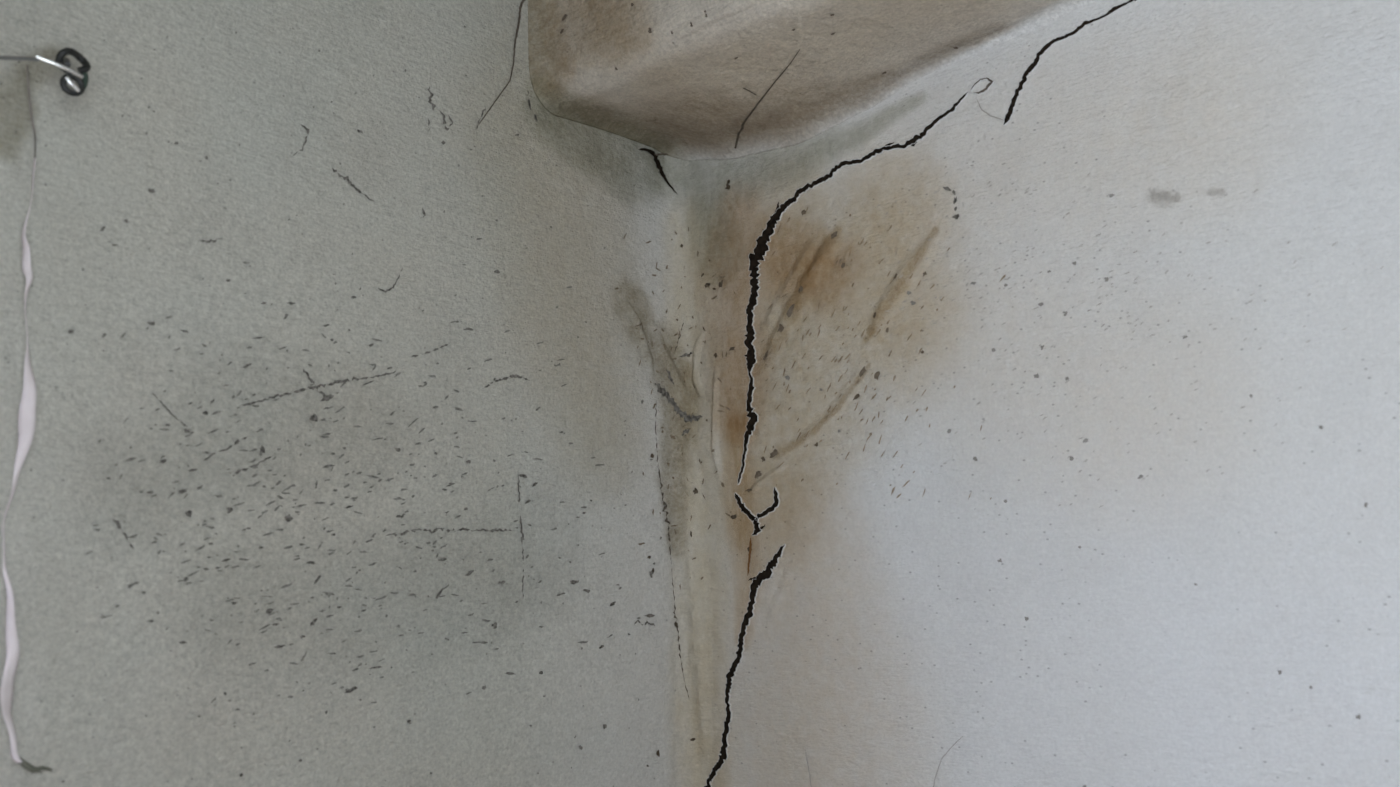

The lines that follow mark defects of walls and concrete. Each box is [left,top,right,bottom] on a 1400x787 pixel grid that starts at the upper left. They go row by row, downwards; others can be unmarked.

crack [638,148,677,194]
crack [703,0,1141,787]